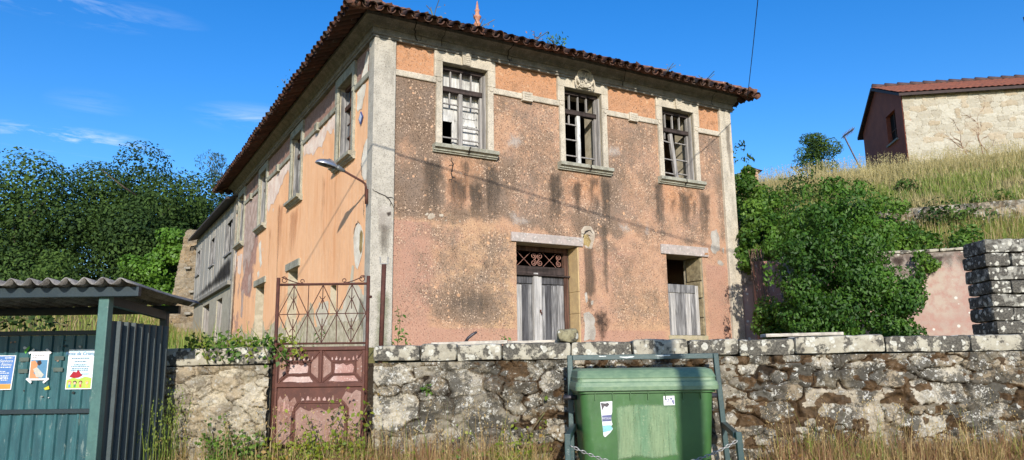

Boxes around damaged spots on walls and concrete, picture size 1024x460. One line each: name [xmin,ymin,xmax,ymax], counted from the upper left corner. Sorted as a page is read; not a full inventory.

flaking render [304,115,335,156]
water stain [425,163,440,193]
water stain [452,165,498,200]
water stain [551,176,560,205]
water stain [574,181,609,210]
water stain [584,249,607,337]